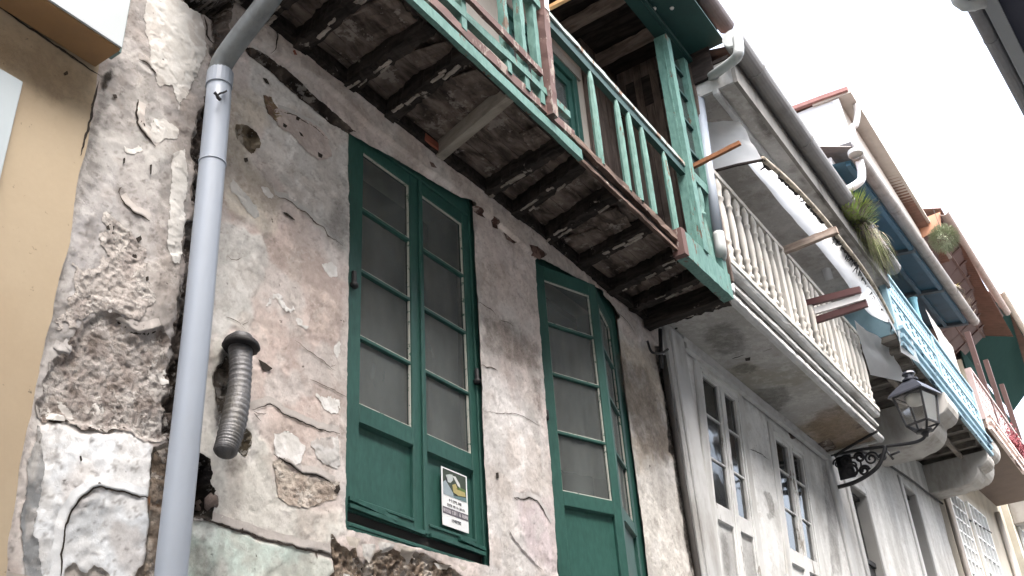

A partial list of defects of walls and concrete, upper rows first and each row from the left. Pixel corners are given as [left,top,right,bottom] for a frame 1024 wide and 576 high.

peeling [144,0,207,110]
flaking render [235,124,261,154]
flaking render [246,47,356,160]
peeling [124,118,188,263]
flaking render [20,212,171,576]
crack [250,396,340,434]
flaking render [273,431,340,508]
crack [50,476,149,576]
flaking render [330,534,466,576]